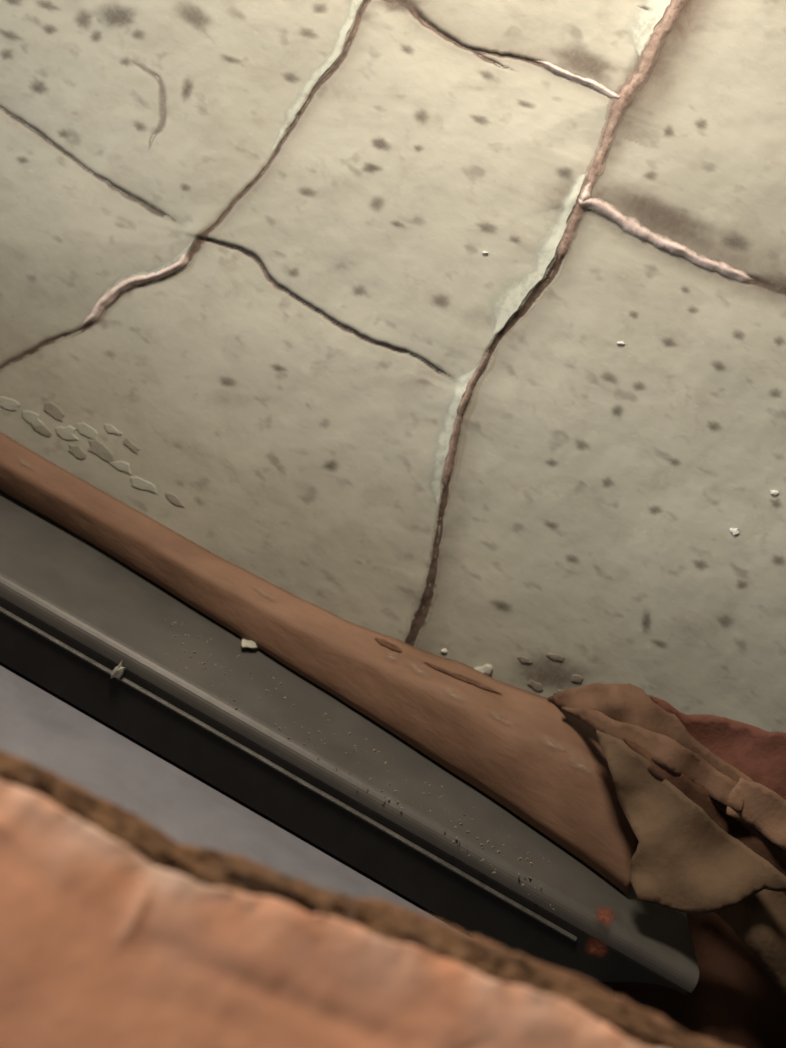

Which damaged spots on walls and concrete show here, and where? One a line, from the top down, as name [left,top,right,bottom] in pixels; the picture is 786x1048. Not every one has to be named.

crack [0,0,786,646]